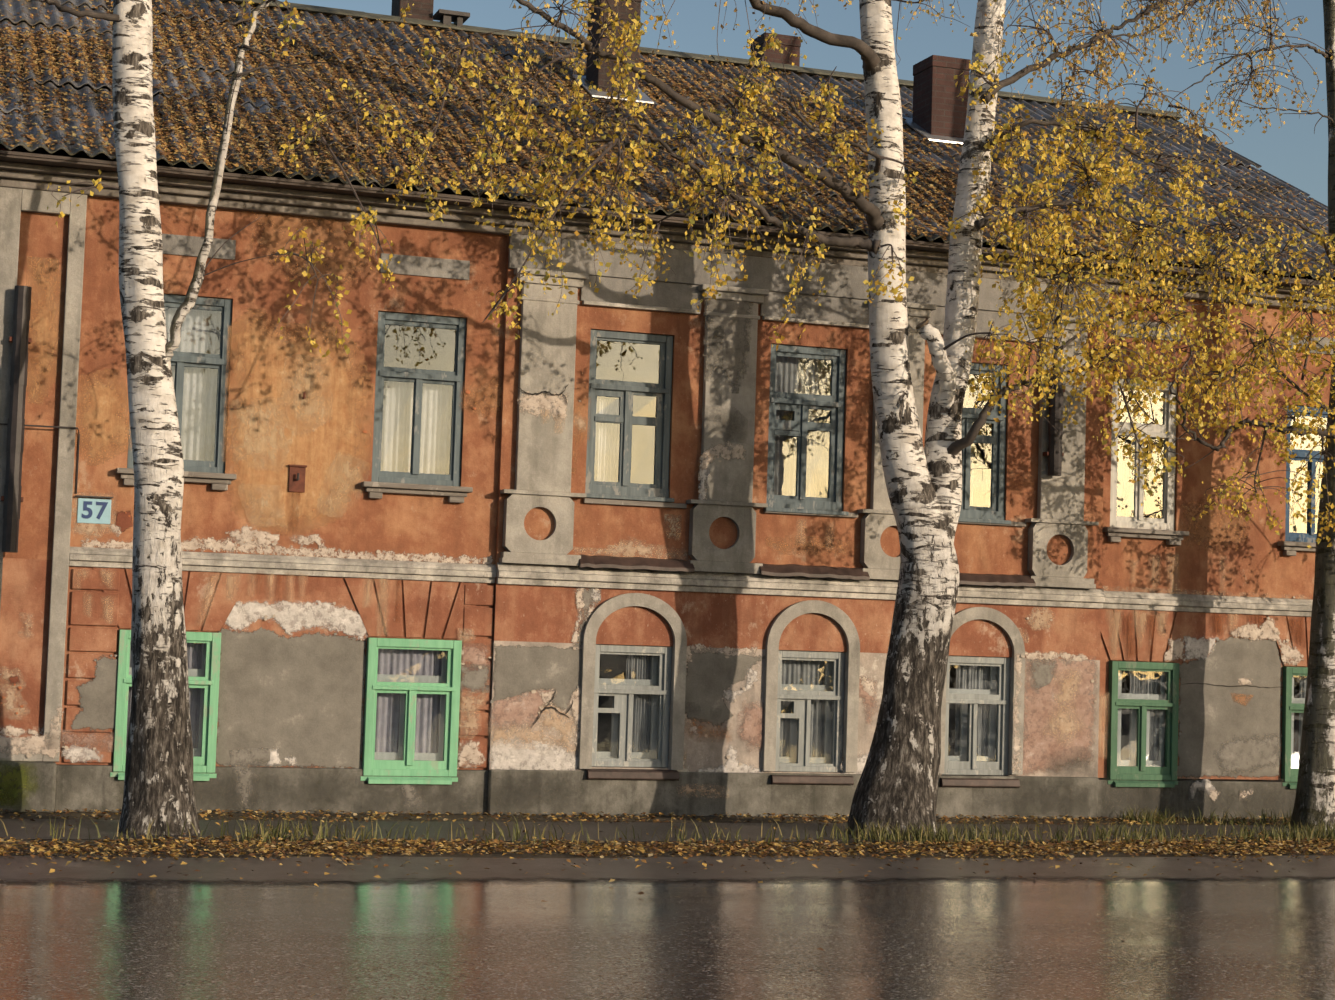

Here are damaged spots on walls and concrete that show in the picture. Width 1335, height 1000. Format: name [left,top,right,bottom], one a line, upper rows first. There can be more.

peeling [181,316,493,565]
peeling [517,391,587,472]
spalling [73,495,133,549]
spalling [0,654,118,763]
spalling [216,601,367,769]
spalling [457,587,601,769]
crack [531,690,573,728]
spalling [685,643,767,773]
spalling [1164,617,1304,779]